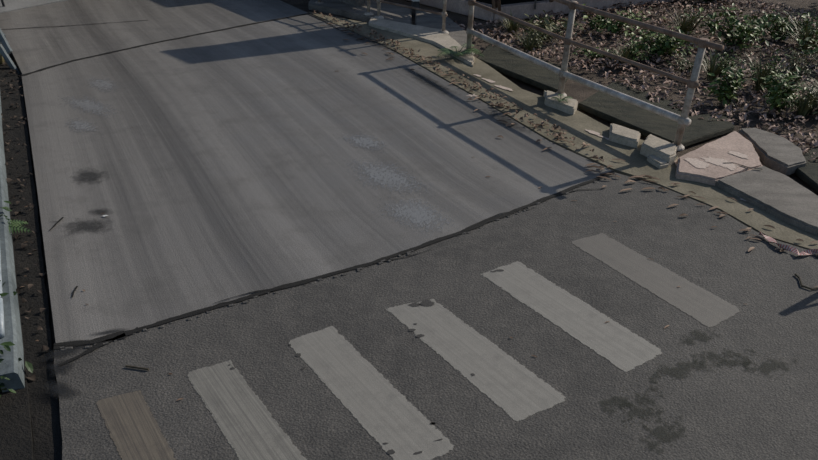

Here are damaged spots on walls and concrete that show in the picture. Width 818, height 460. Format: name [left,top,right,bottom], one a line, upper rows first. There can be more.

leakage [71,210,106,232]